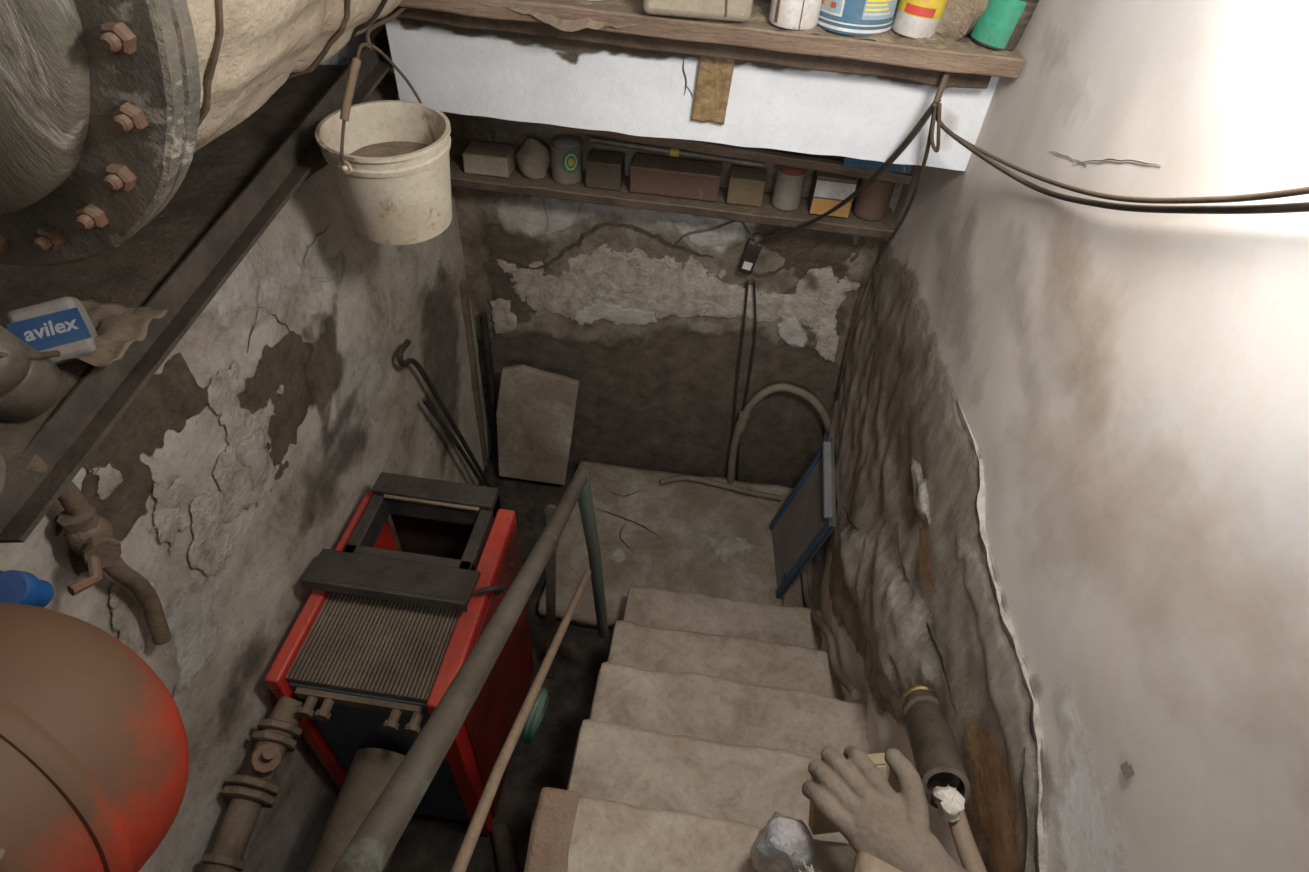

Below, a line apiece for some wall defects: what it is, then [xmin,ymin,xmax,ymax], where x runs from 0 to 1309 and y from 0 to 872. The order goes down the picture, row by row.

peeling [70,548,89,576]
peeling [109,581,149,658]
peeling [82,353,284,576]
spalling [489,195,1052,872]
water stain [1056,690,1122,872]